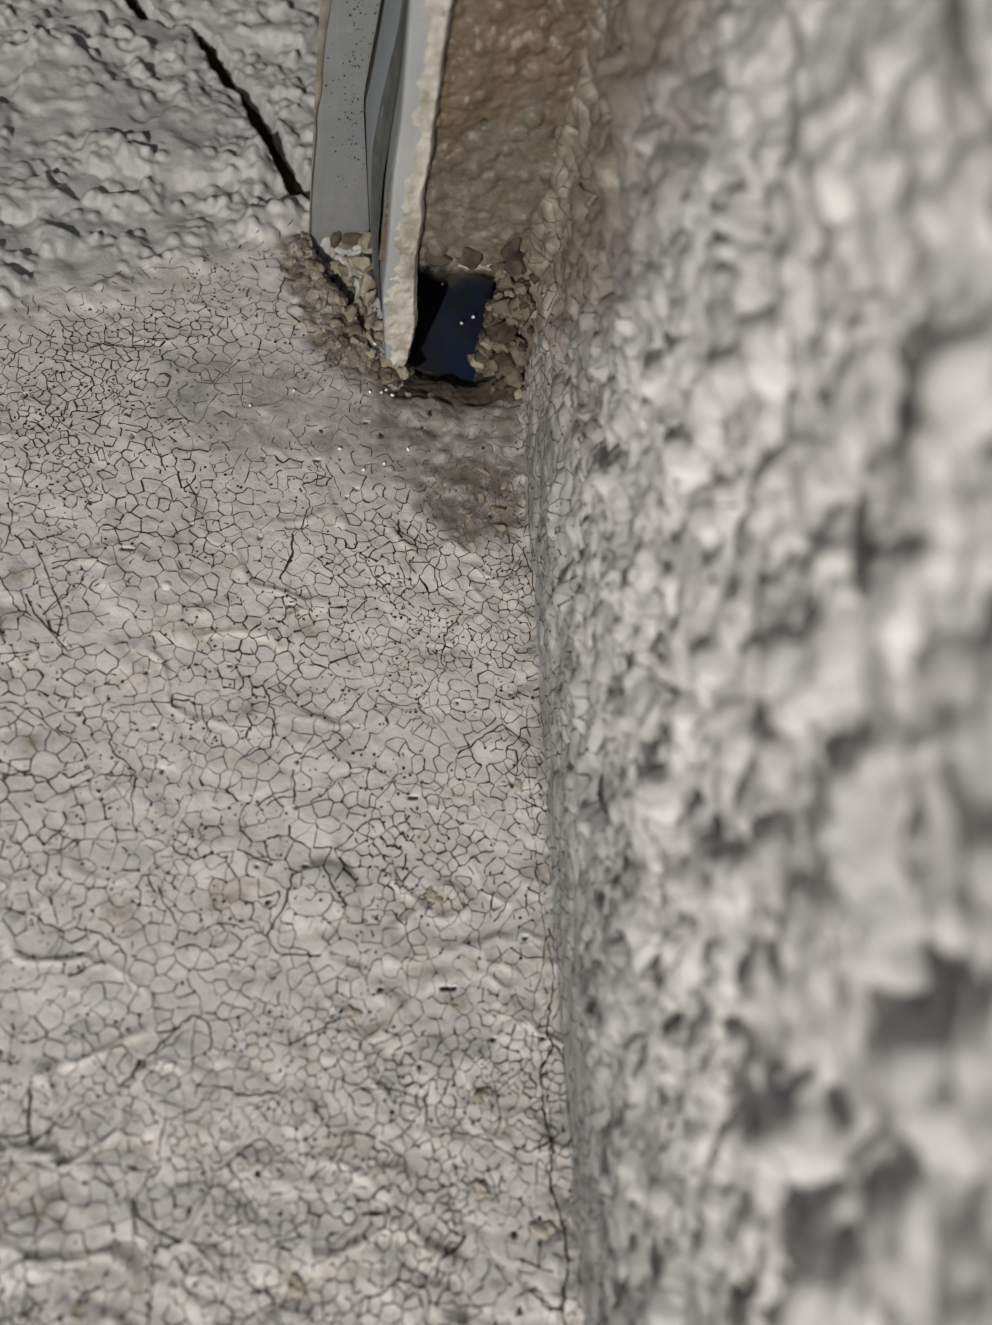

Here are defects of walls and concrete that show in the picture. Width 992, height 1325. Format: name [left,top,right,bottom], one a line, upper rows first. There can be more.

crack [125,0,309,199]
spalling [283,231,415,386]
spalling [424,246,483,270]
spalling [500,236,526,261]
water stain [416,461,521,542]
crack [0,35,815,1325]